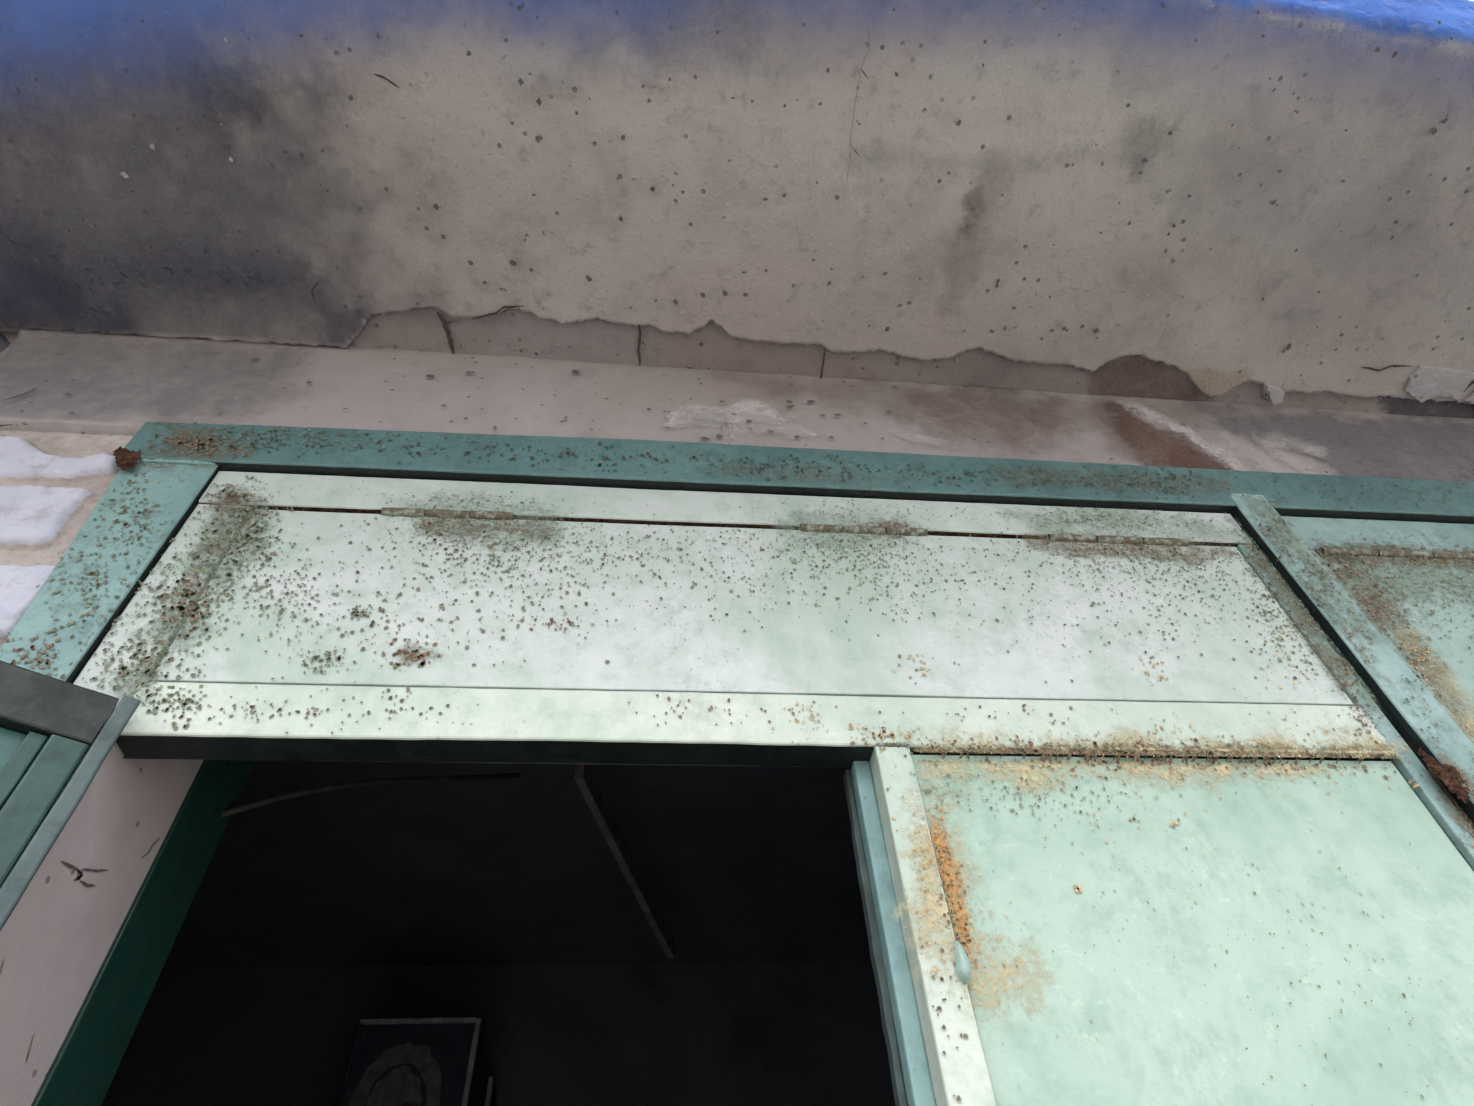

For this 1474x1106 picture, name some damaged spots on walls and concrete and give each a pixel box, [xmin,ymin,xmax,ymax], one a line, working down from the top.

spalling [349,306,1474,440]
damp [1119,397,1474,482]
rust [1,402,1474,1055]